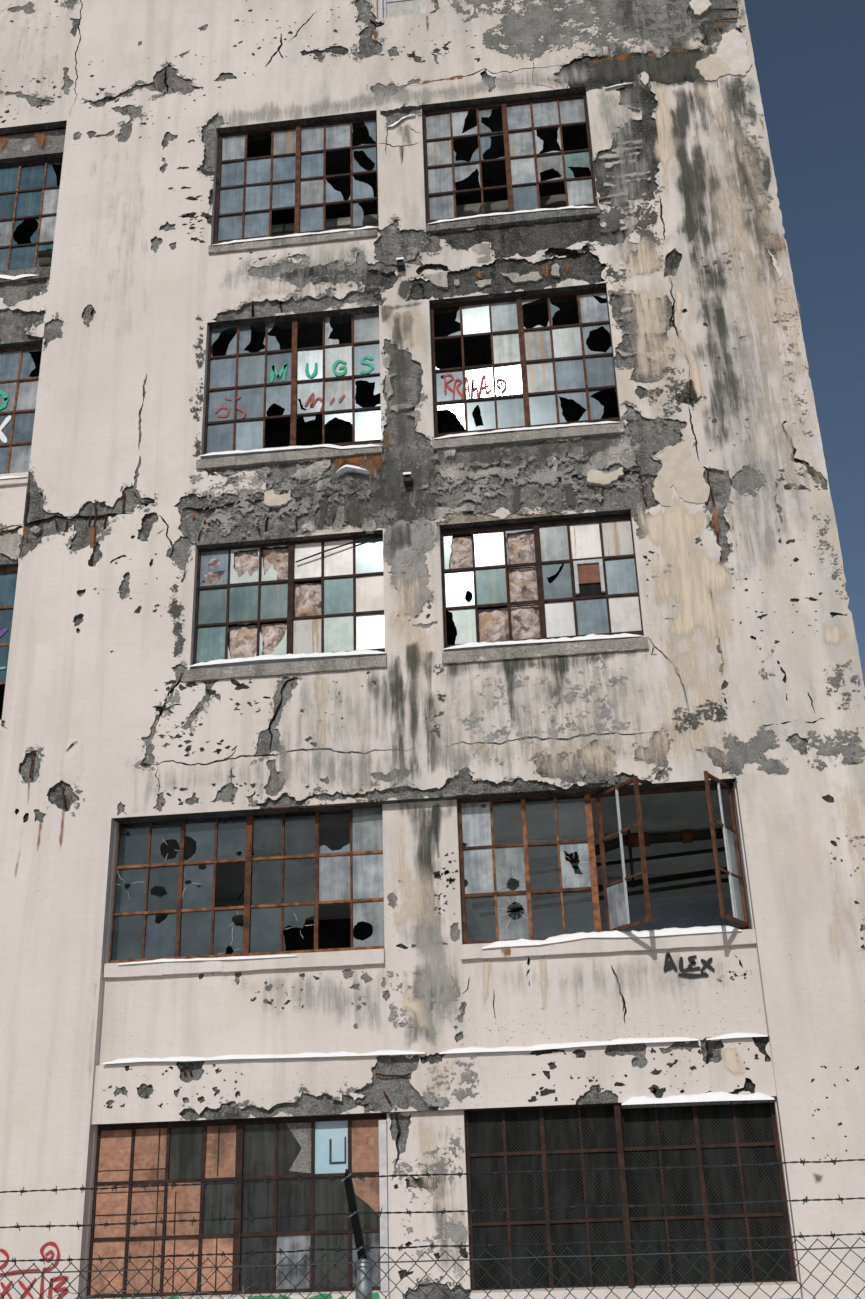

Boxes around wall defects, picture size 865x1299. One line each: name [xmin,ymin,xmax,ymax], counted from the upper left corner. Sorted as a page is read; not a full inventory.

crack [69,0,83,116]
water stain [229,0,806,554]
crack [132,375,174,555]
water stain [391,579,447,780]
water stain [503,652,609,718]
spalling [14,741,84,848]
crack [134,748,413,795]
water stain [526,725,620,771]
water stain [395,806,454,1038]
spalling [251,973,321,1009]
peeling [342,969,467,1042]